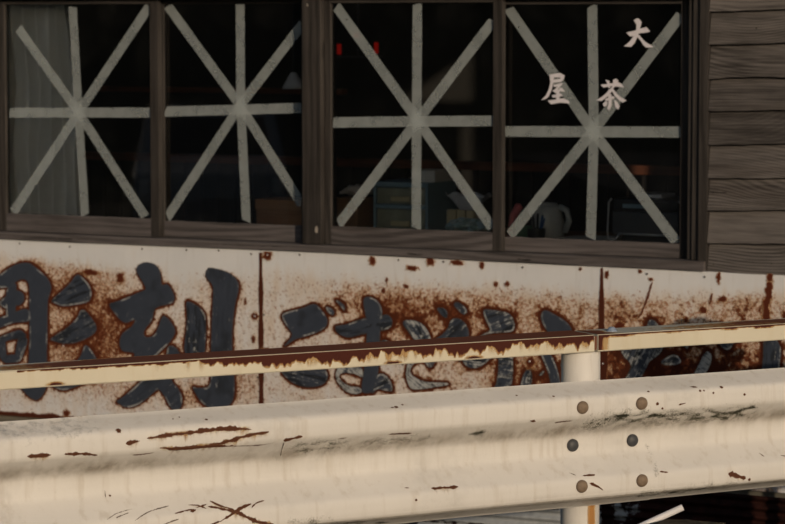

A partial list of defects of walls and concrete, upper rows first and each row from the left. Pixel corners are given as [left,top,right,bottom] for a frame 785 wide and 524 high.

rust [0,251,785,410]
rust [0,409,74,419]